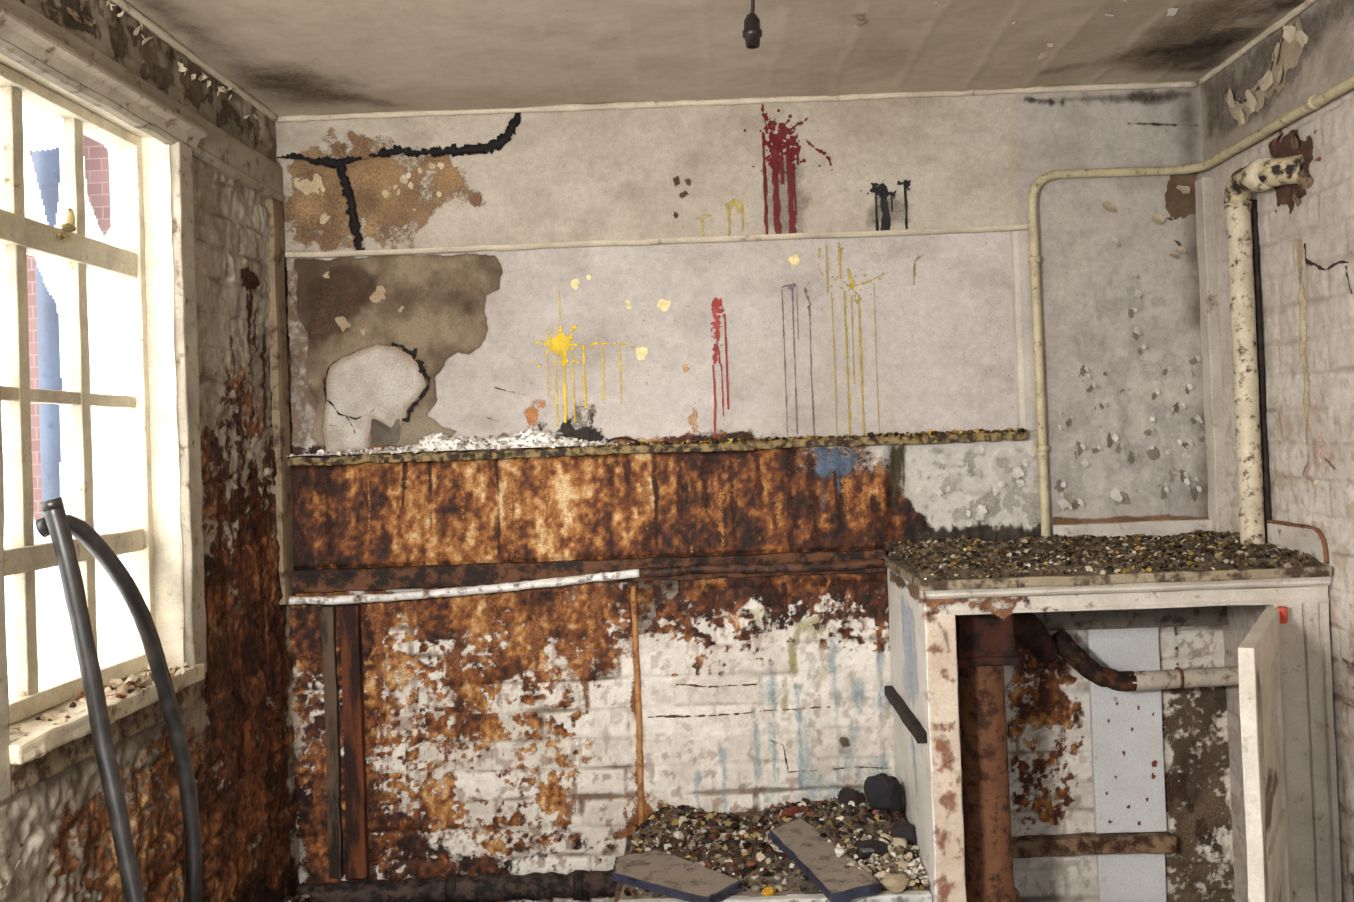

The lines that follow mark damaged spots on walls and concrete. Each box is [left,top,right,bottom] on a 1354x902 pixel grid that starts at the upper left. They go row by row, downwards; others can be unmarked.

leakage [1266,0,1303,11]
leakage [1147,28,1282,129]
peeling [1224,18,1308,128]
crack [276,112,521,250]
peeling [1151,172,1198,224]
flaking render [1268,123,1329,214]
flaking render [294,253,503,457]
rust [186,282,934,902]
rust [44,791,125,902]
rust [118,726,185,902]
rust [934,724,959,810]
rust [1007,636,1084,835]